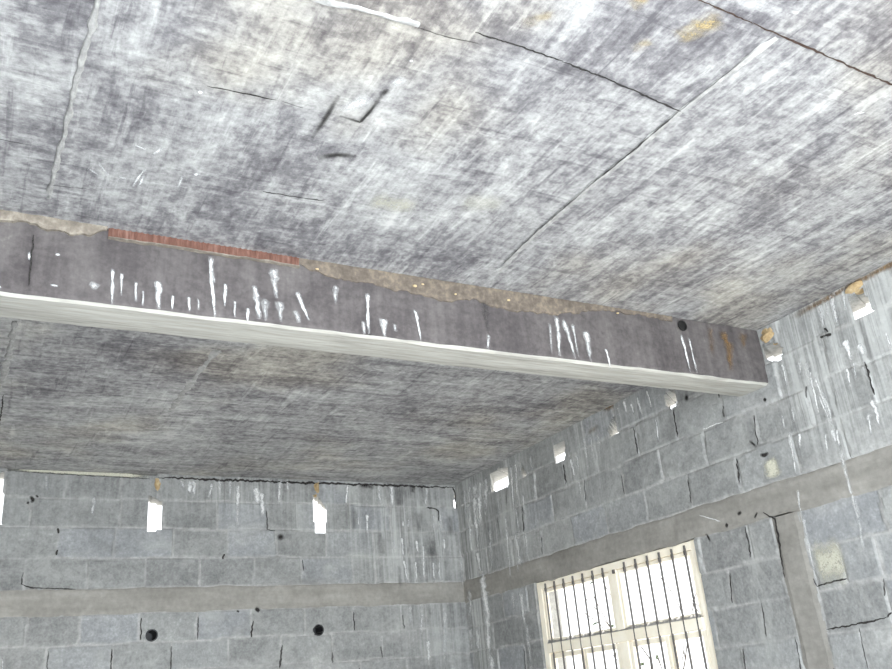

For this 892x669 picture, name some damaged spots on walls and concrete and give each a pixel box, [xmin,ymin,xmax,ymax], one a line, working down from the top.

crack [420,0,892,264]
corrosion [108,228,300,269]
water stain [210,260,236,314]
spalling [299,258,673,322]
water stain [556,318,590,355]